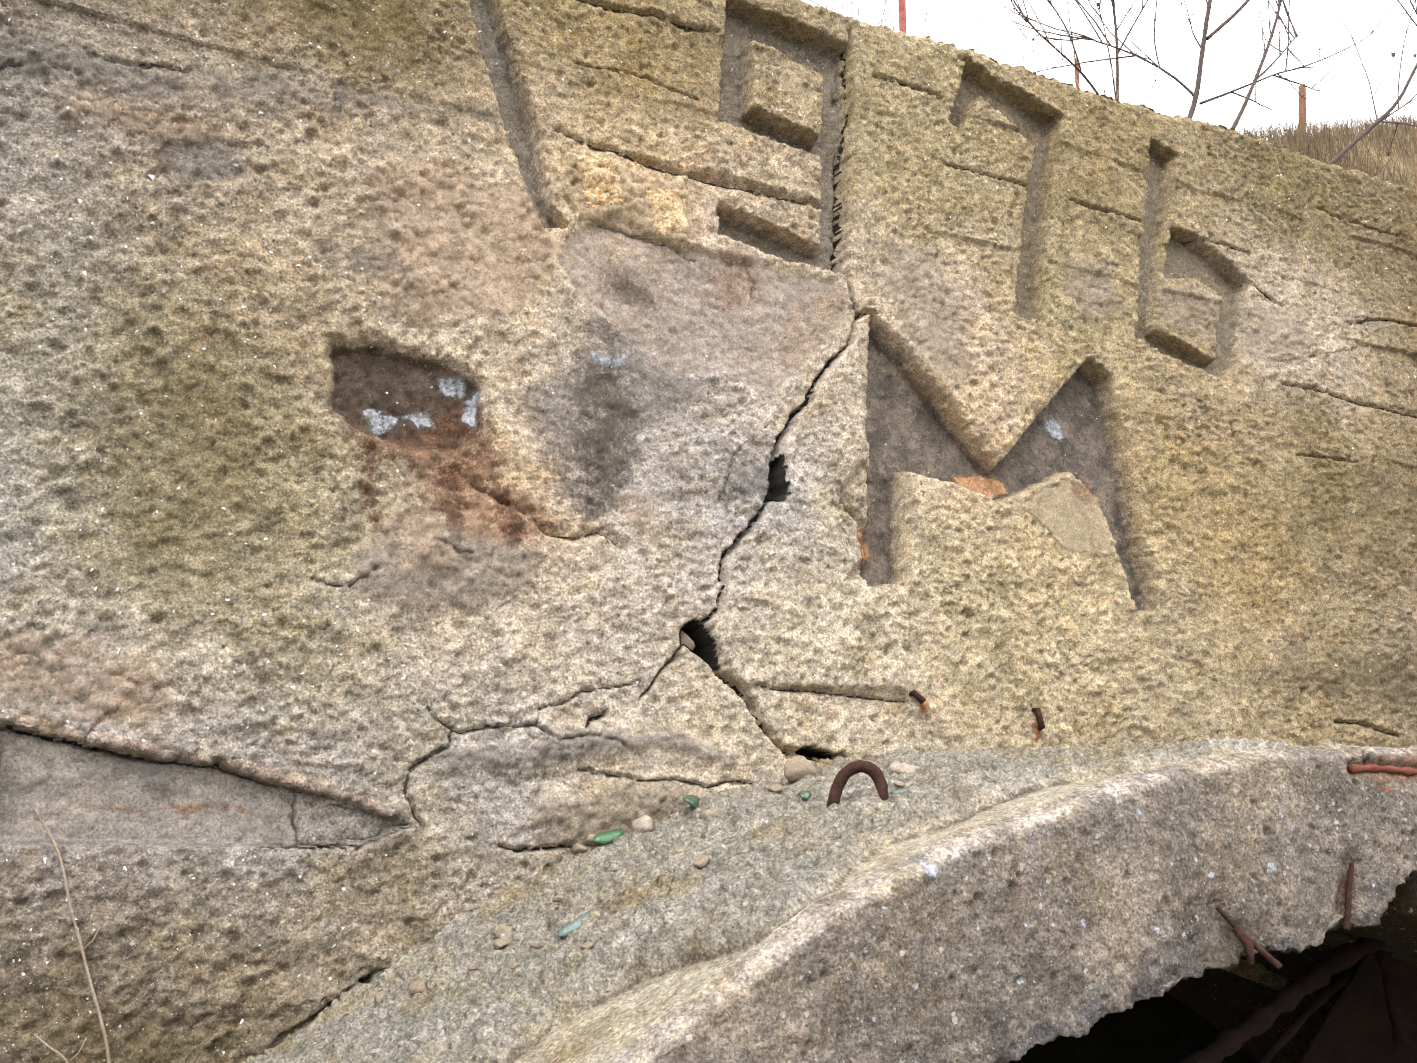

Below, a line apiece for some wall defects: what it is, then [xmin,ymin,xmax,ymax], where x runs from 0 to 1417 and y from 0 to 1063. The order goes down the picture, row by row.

crack [0,54,188,73]
crack [830,50,848,271]
corrosion [327,397,551,549]
crack [396,314,867,823]
crack [5,706,235,775]
corrosion [1357,755,1417,791]
crack [259,822,357,849]
crack [499,845,572,853]